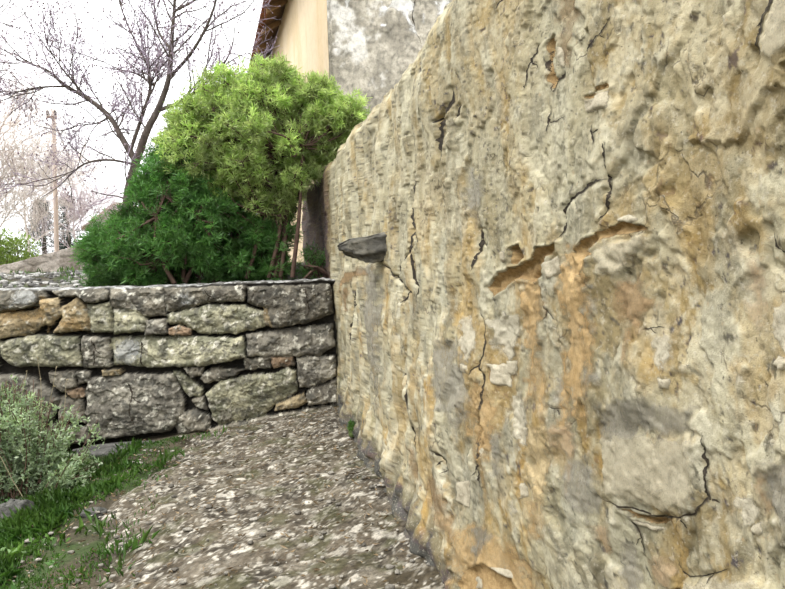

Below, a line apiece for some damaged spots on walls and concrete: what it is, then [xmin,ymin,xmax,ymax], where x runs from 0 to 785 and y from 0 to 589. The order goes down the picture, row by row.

flaking render [380,0,415,32]
crack [755,0,773,54]
crack [432,91,462,160]
crack [557,125,612,238]
crack [384,181,419,304]
crack [471,228,487,270]
spalling [488,244,561,296]
spalling [576,215,648,257]
crack [469,315,486,410]
crack [471,435,482,489]
crack [601,433,720,552]